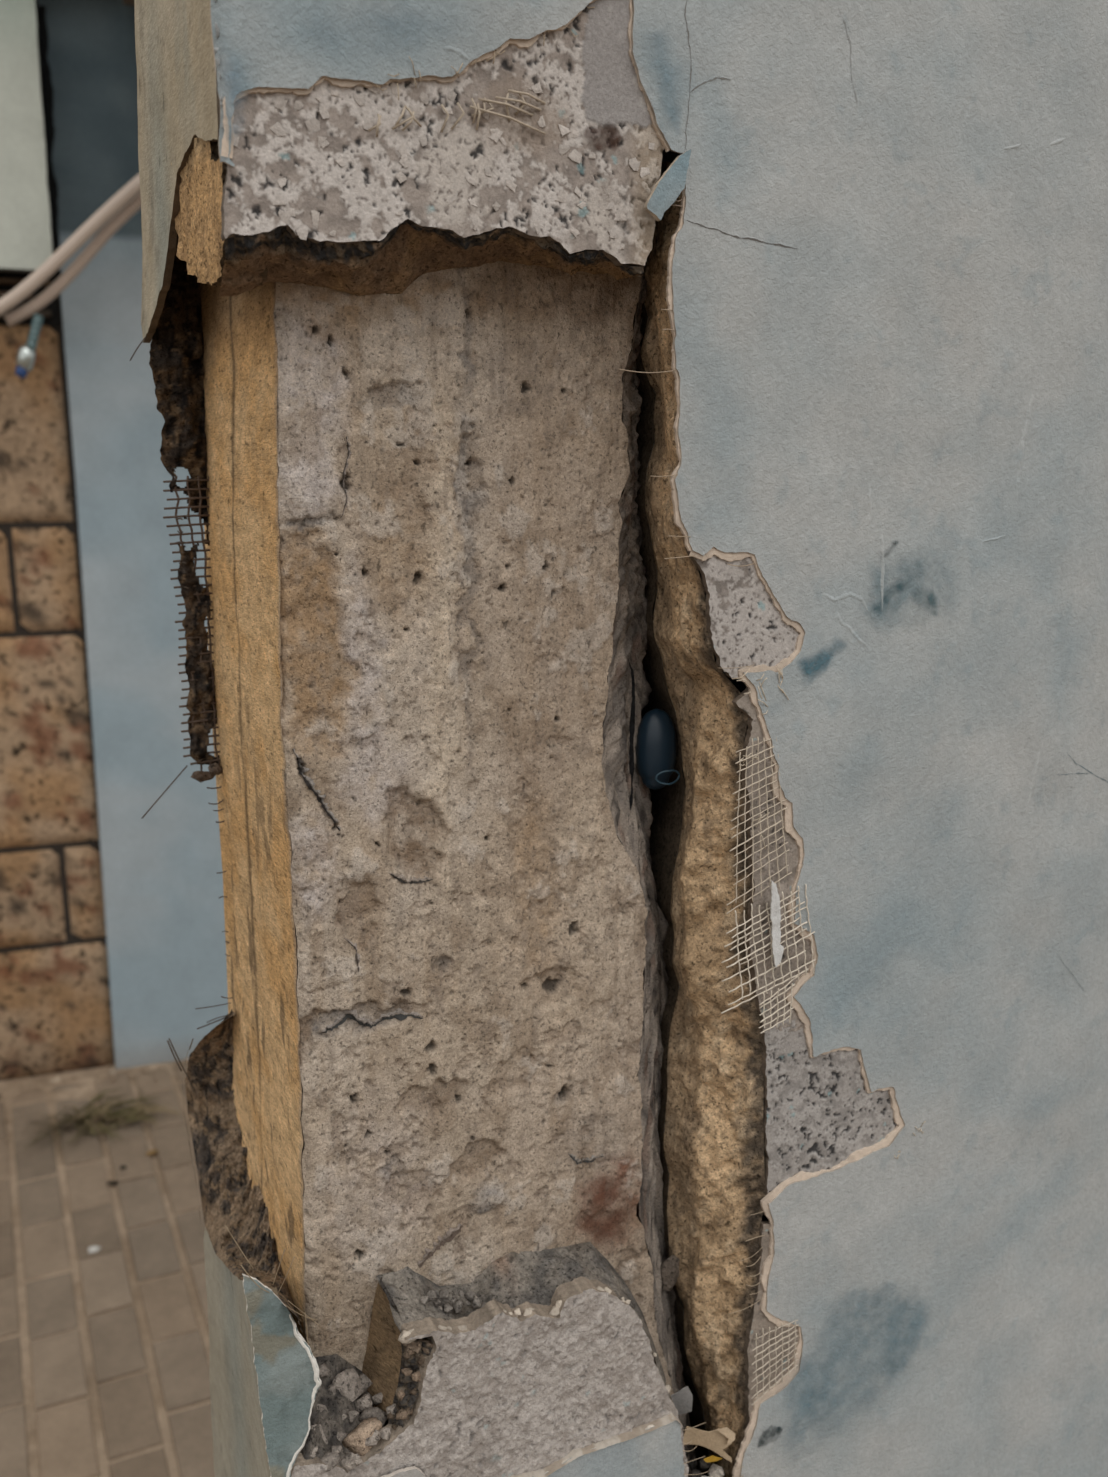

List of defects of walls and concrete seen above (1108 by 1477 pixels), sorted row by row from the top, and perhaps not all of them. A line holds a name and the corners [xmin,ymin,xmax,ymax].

peeling [130,0,691,823]
crack [345,938,360,972]
crack [321,1008,423,1033]
spalling [167,996,689,1477]
crack [601,0,796,1477]
spalling [684,547,926,1477]
water stain [803,653,832,675]